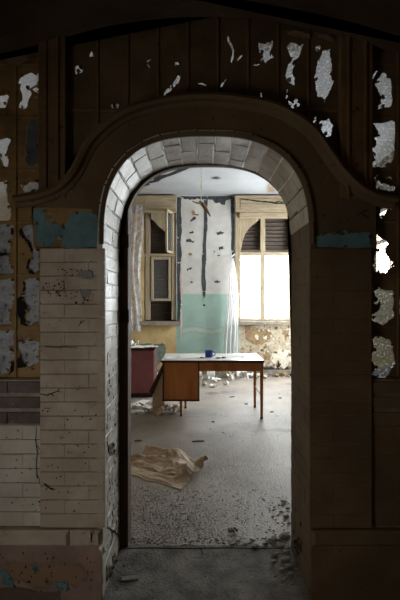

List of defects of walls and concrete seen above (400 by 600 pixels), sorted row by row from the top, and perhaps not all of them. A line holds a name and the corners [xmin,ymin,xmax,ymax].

peeling [19,73,39,109]
peeling [0,137,13,167]
peeling [315,230,380,252]
peeling [0,181,99,375]
flaking render [241,325,291,369]
peeling [372,336,395,377]
crack [34,437,55,490]